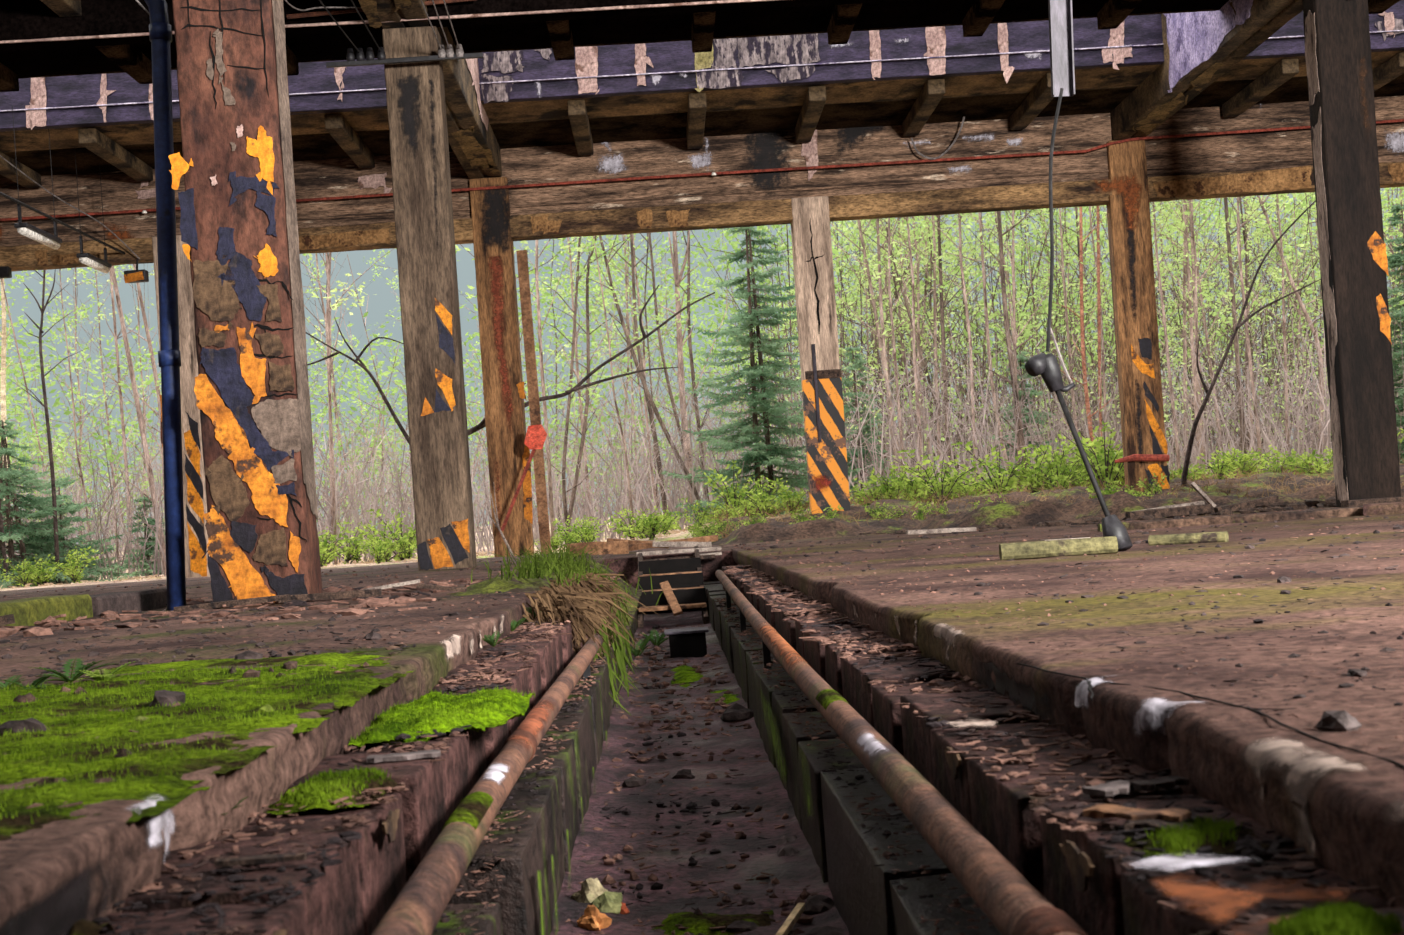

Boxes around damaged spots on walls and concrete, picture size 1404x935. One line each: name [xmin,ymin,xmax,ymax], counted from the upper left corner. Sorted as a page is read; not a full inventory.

crack [181,0,269,109]
peeling [575,46,599,95]
peeling [634,43,654,86]
peeling [695,33,820,92]
peeling [869,30,882,81]
peeling [924,26,946,75]
peeling [998,23,1014,83]
peeling [25,77,47,130]
crack [805,218,824,332]
peeling [135,0,392,607]
rust [759,625,805,665]
rust [503,701,554,746]